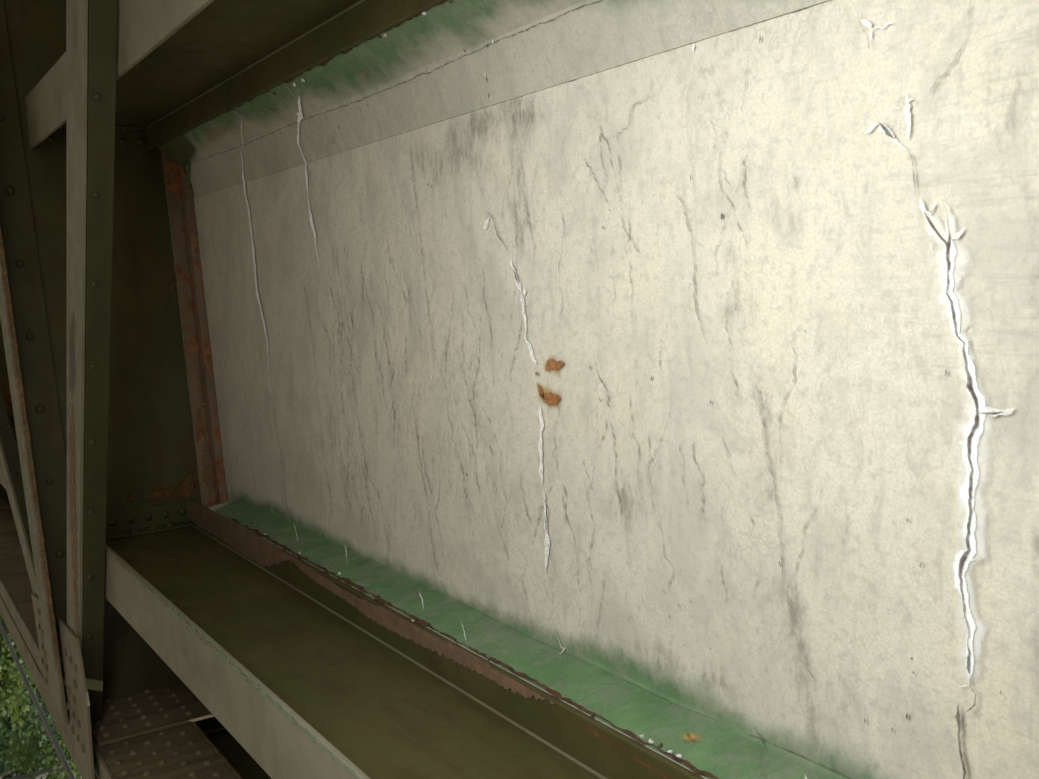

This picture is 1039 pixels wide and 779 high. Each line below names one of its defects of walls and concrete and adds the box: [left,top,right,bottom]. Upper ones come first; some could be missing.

crack [240,118,271,389]
crack [297,97,653,638]
corrosion [535,359,564,405]
crack [865,49,1014,779]